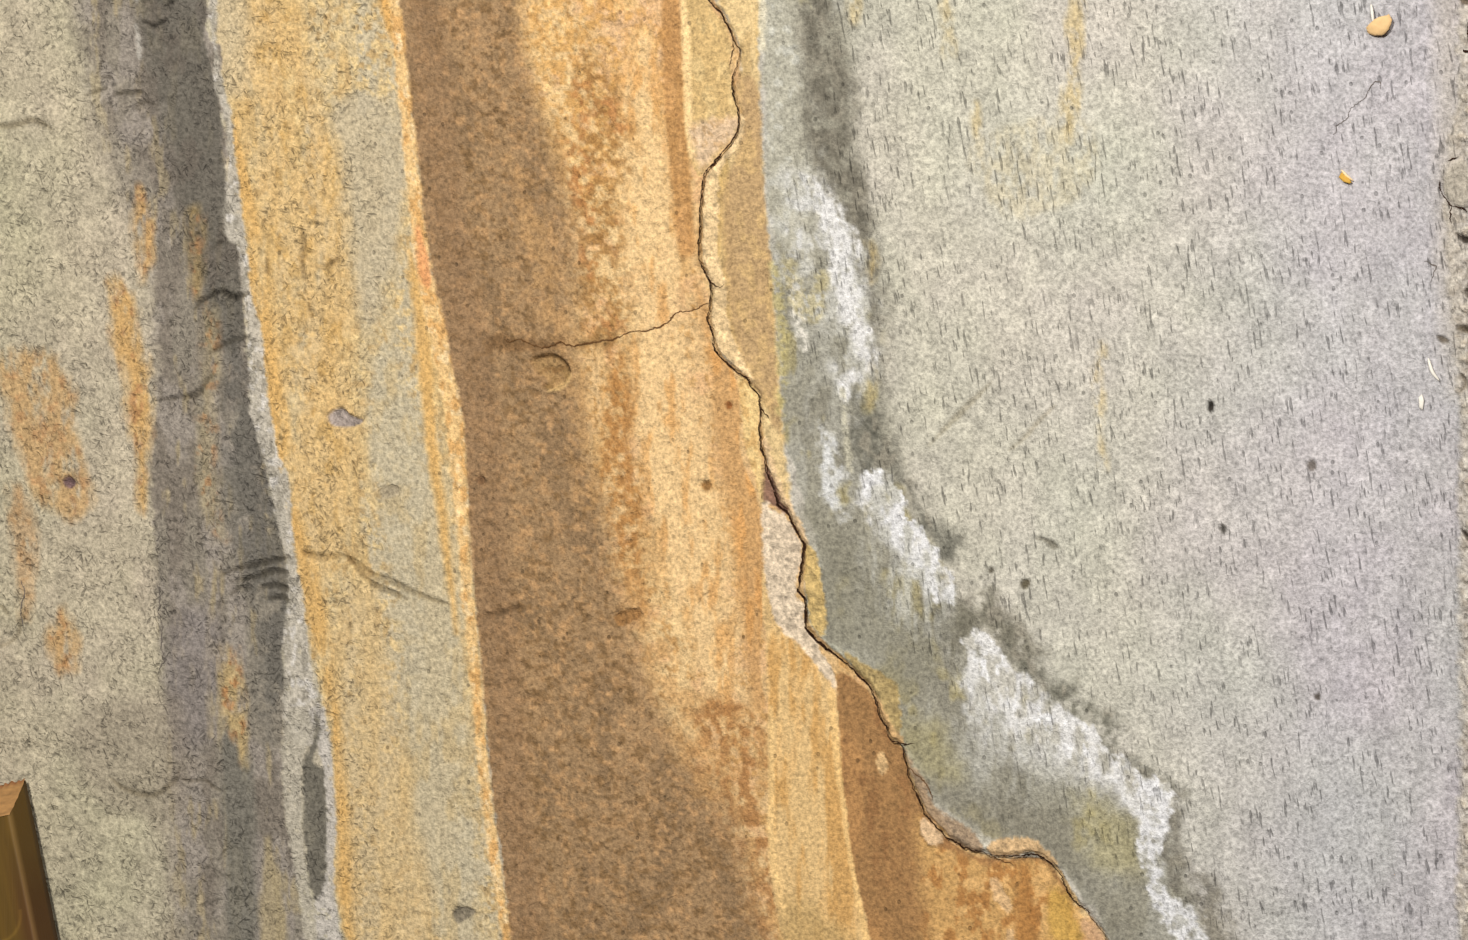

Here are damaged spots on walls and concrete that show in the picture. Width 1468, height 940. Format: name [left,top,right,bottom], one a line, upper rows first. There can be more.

damp [51,0,344,940]
rust [527,0,878,940]
crack [506,0,1106,940]
rust [861,358,883,413]
rust [860,237,885,289]
damp [755,0,1249,940]